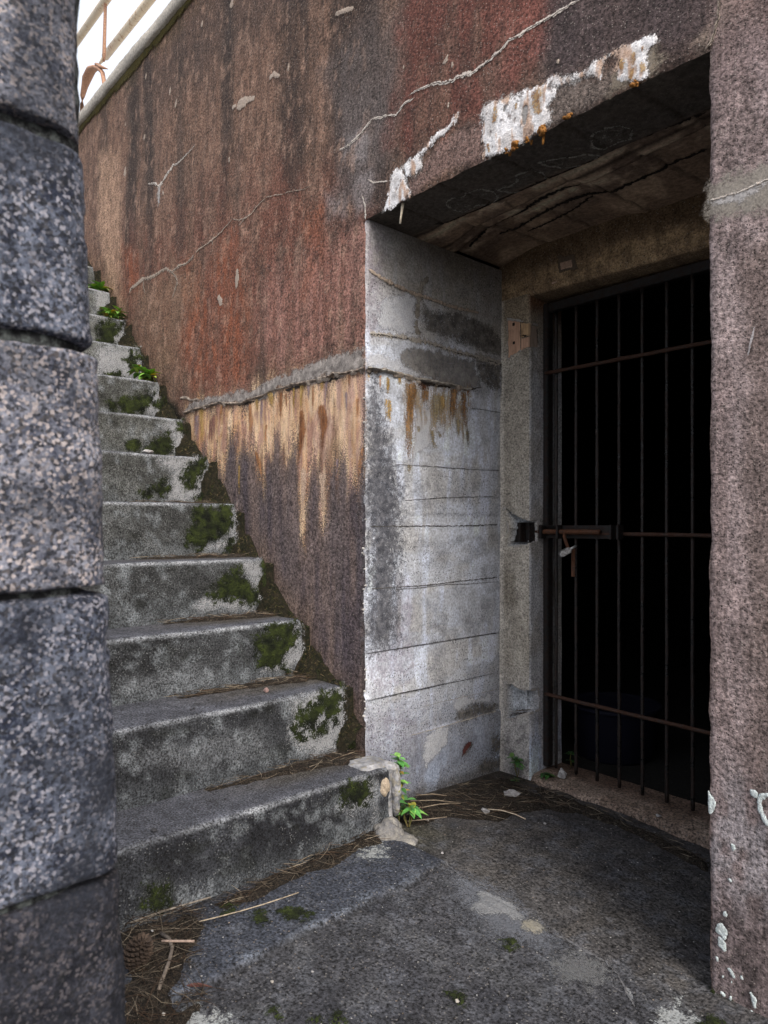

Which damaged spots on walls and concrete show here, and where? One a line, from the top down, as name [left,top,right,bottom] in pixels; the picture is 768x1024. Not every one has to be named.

crack [340,0,579,150]
crack [148,145,195,202]
crack [129,184,312,298]
damp [384,112,459,211]
rust [504,124,547,154]
crack [434,149,707,248]
damp [93,290,142,379]
rust [185,355,471,547]
damp [360,293,502,658]
damp [205,503,238,551]
damp [192,557,262,614]
damp [260,620,305,677]